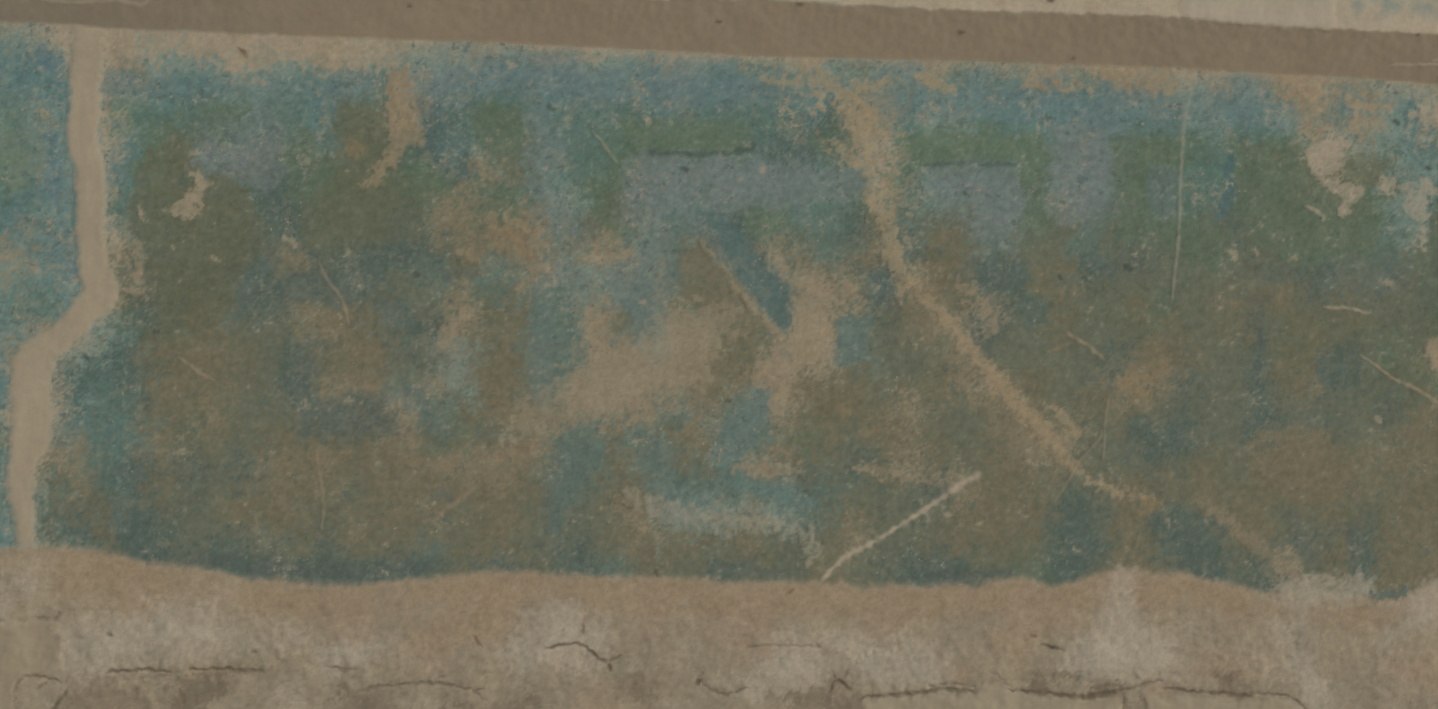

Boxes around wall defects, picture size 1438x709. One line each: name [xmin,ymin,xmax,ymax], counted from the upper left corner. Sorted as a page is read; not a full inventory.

crack [544,622,623,672]
crack [1040,641,1065,652]
crack [9,671,71,709]
flaking render [59,675,152,709]
crack [104,664,266,680]
crack [328,664,490,702]
flaking render [598,669,670,708]
crack [694,668,751,698]
crack [827,670,1311,709]